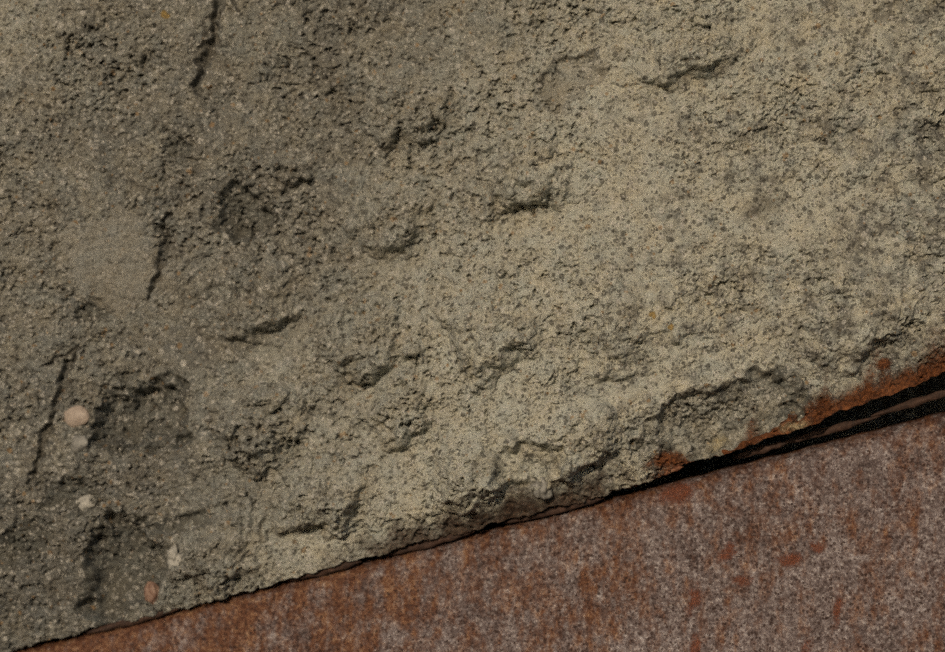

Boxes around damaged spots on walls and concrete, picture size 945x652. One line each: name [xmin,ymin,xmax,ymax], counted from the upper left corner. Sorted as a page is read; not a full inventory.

crack [189,0,241,97]
crack [25,344,81,486]
corrosion [646,452,692,475]
corrosion [712,349,945,457]
corrosion [376,484,605,554]